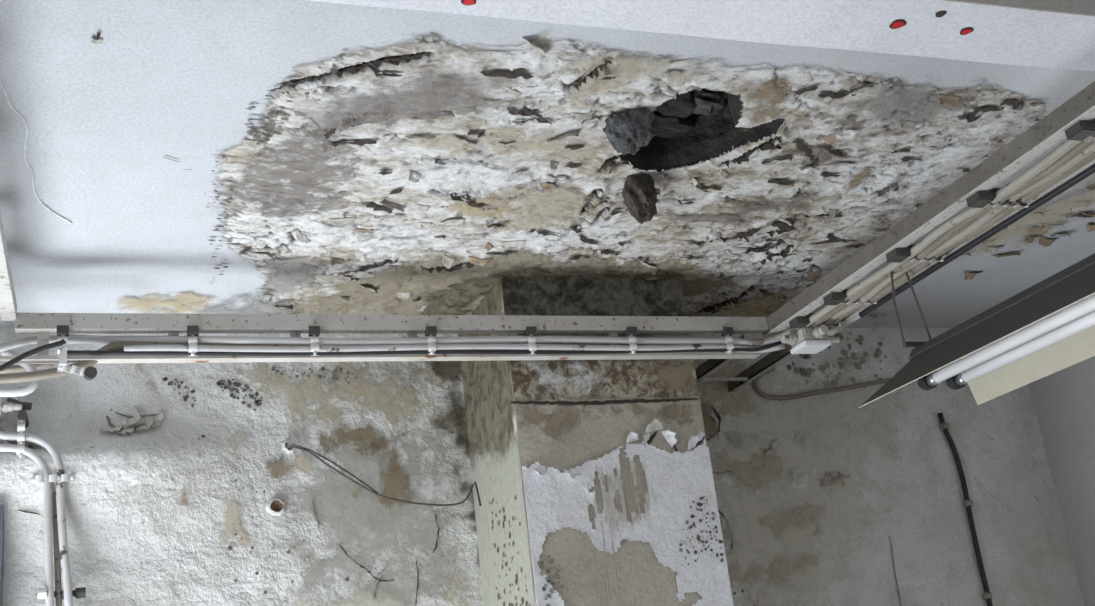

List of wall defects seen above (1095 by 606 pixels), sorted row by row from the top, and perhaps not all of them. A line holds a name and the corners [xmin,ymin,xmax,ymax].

flaking render [214,32,1046,317]
water stain [150,377,196,407]
water stain [216,360,597,606]
water stain [458,334,525,344]
peeling [510,359,734,606]
water stain [633,309,902,606]